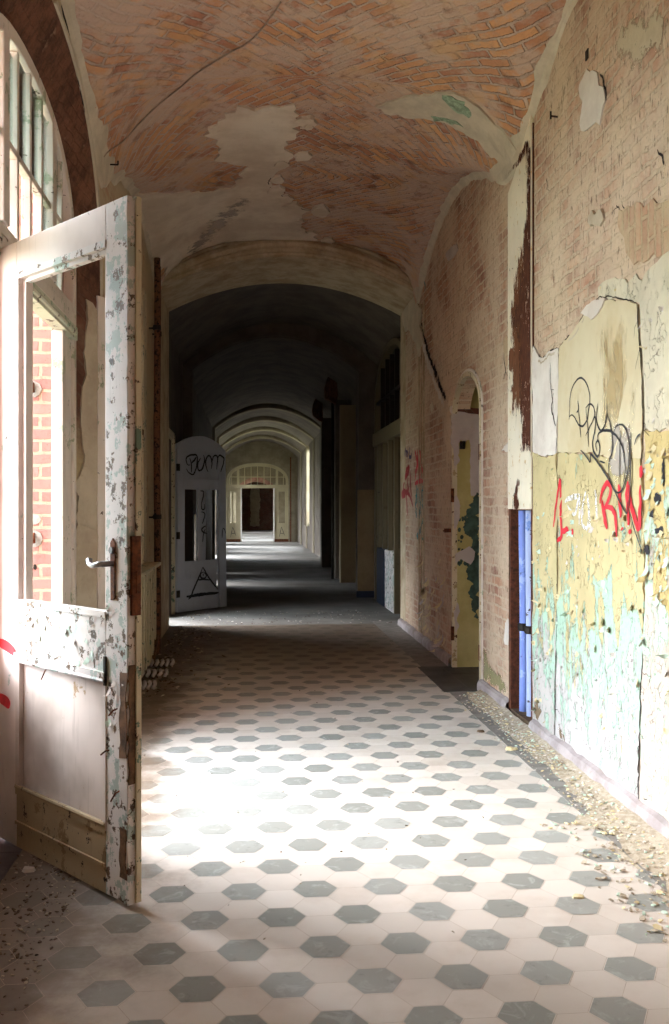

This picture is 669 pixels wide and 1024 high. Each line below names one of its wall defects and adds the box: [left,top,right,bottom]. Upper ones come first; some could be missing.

flaking render [54,1,100,208]
flaking render [138,103,335,276]
flaking render [376,91,516,165]
flaking render [76,259,103,608]
peeling [530,198,669,821]